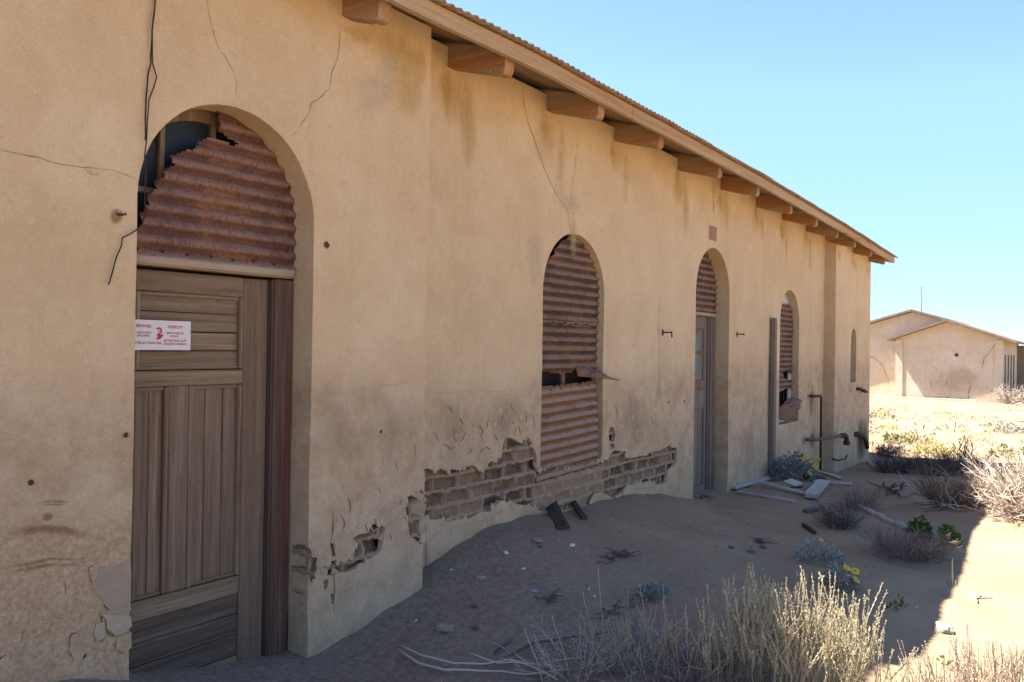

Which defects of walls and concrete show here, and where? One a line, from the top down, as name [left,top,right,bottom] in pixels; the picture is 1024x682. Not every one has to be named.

spalling [404,427,677,566]
peeling [69,560,132,659]
spalling [291,518,383,602]